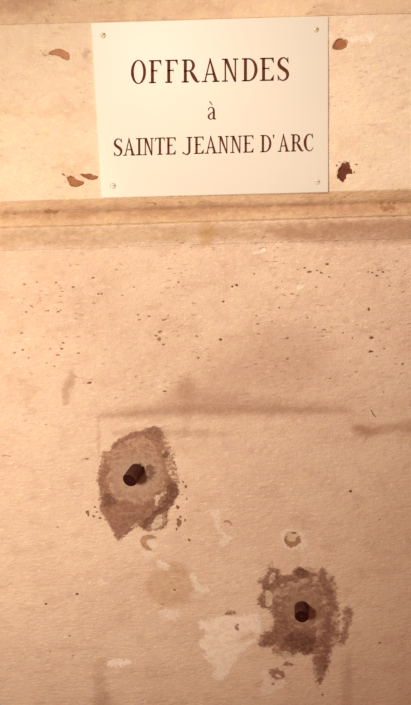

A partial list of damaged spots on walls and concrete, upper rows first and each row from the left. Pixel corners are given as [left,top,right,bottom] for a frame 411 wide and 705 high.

spalling [332,31,375,50]
spalling [48,49,70,60]
spalling [62,173,98,187]